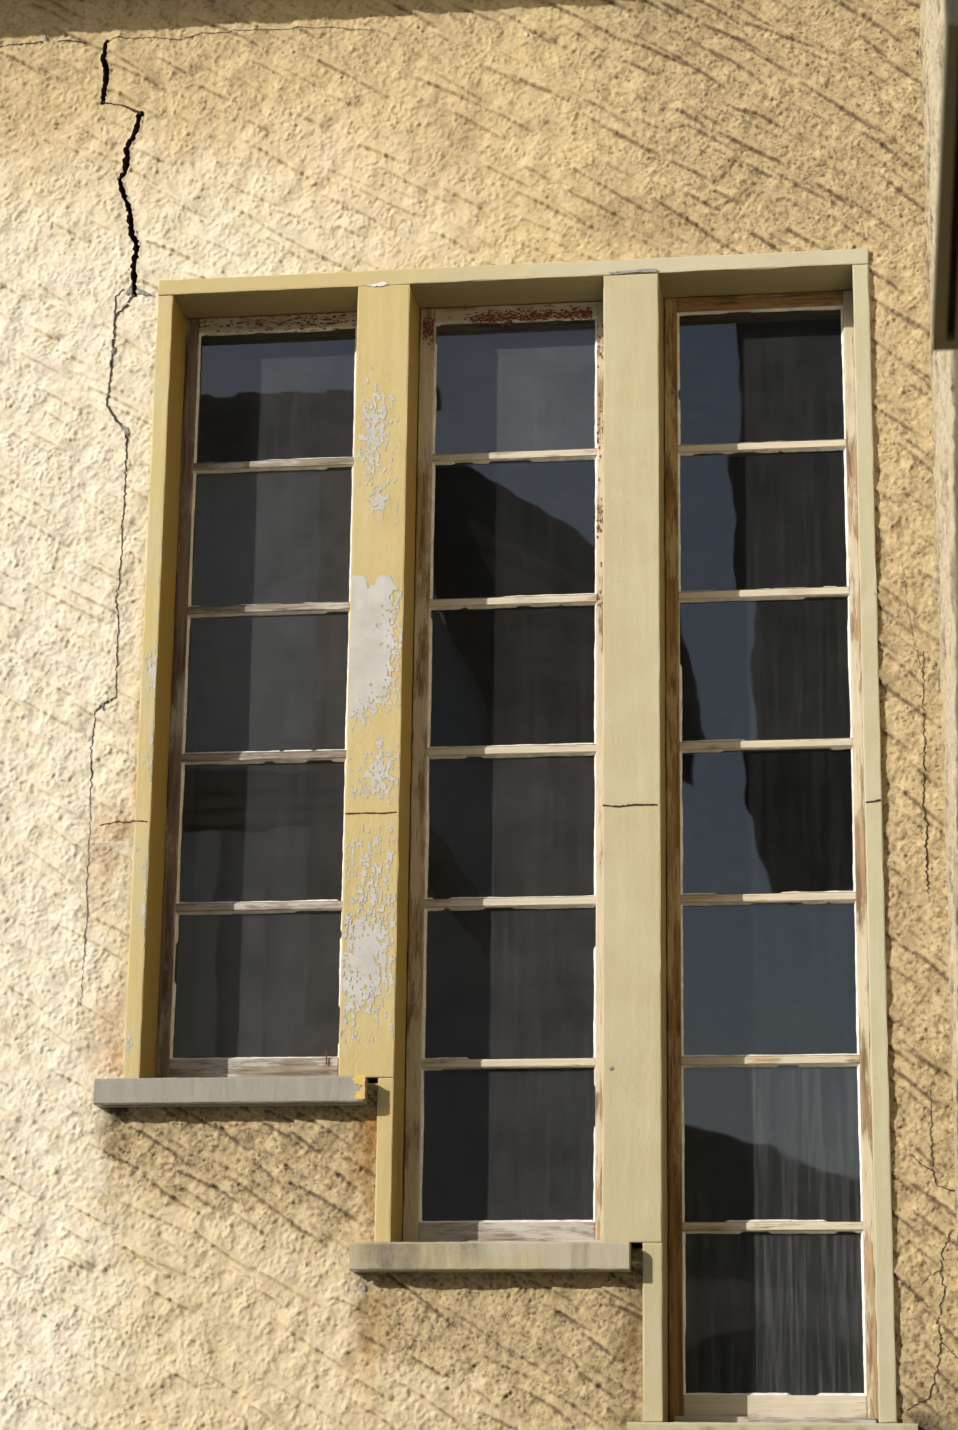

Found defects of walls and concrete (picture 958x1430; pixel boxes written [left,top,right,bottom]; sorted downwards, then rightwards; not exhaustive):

crack [0,26,374,1005]
peeling [355,365,399,523]
peeling [348,575,403,804]
peeling [340,825,396,1043]
crack [912,1090,955,1192]
crack [907,1230,958,1410]